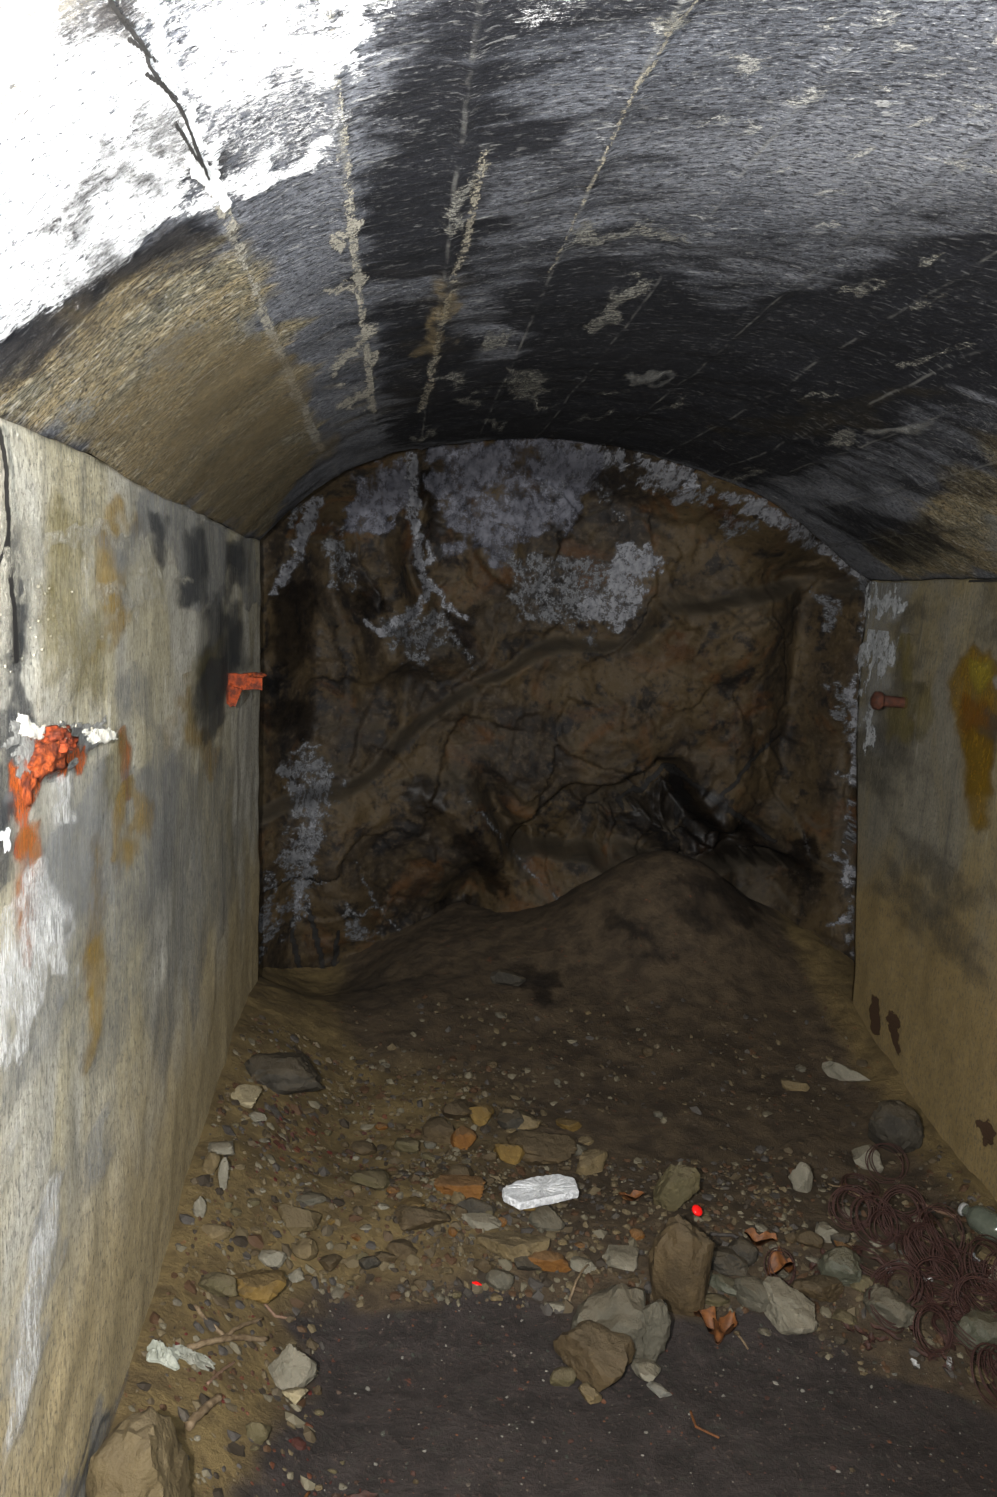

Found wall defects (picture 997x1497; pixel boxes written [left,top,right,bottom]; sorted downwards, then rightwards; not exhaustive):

crack [108,0,210,181]
crack [0,427,19,663]
damp [0,0,908,965]
rust [950,645,997,828]
rust [9,739,86,966]